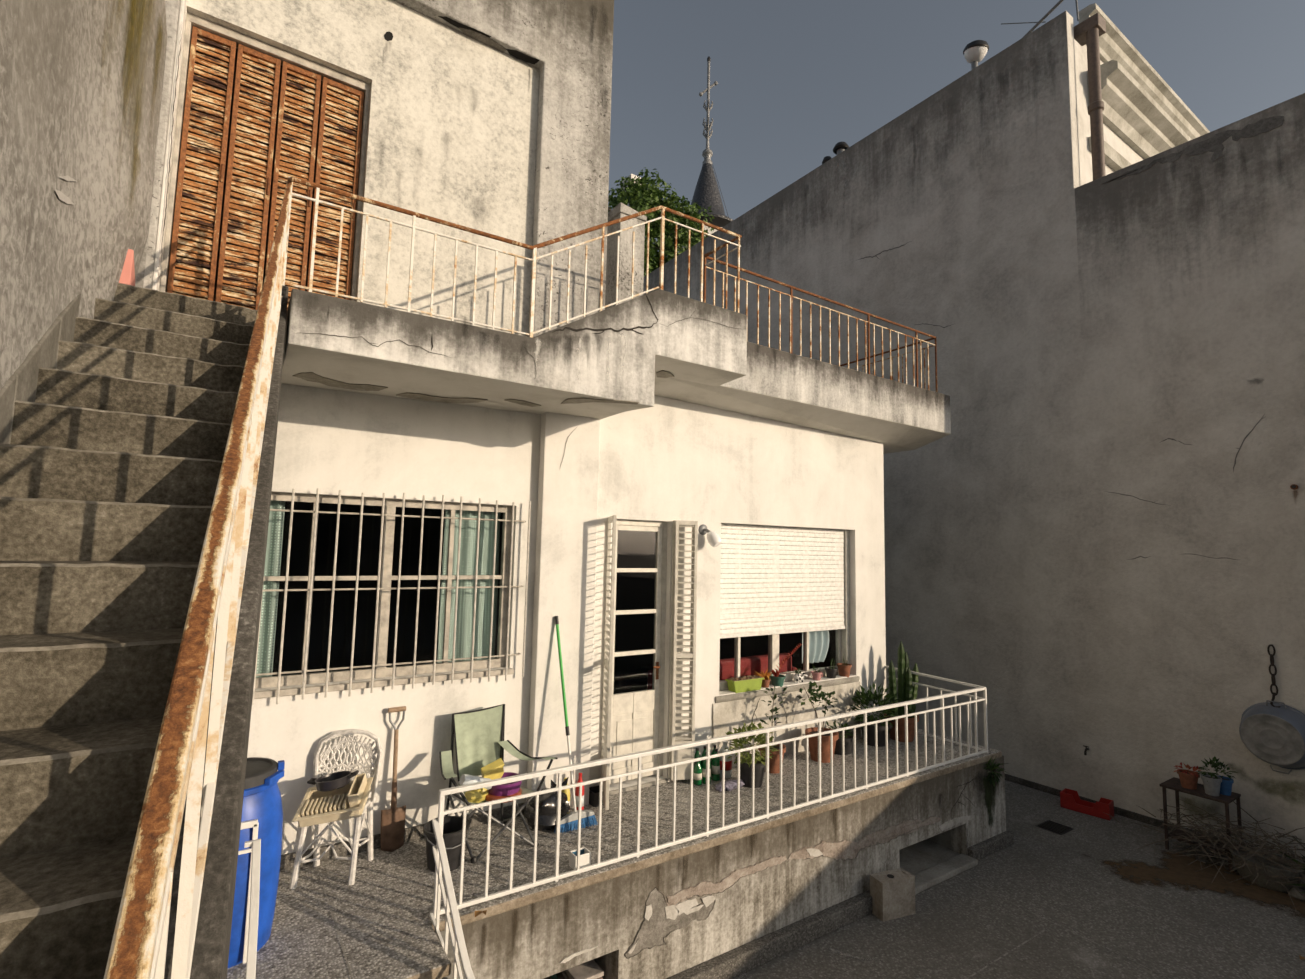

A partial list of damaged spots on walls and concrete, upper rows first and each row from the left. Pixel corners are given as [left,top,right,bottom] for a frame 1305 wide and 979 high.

leakage [119,0,163,133]
crack [858,241,912,260]
crack [305,310,448,357]
crack [515,295,739,377]
peeling [293,372,488,403]
peeling [504,399,541,407]
crack [1233,415,1265,472]
peeling [939,815,975,831]
spalling [624,819,922,959]